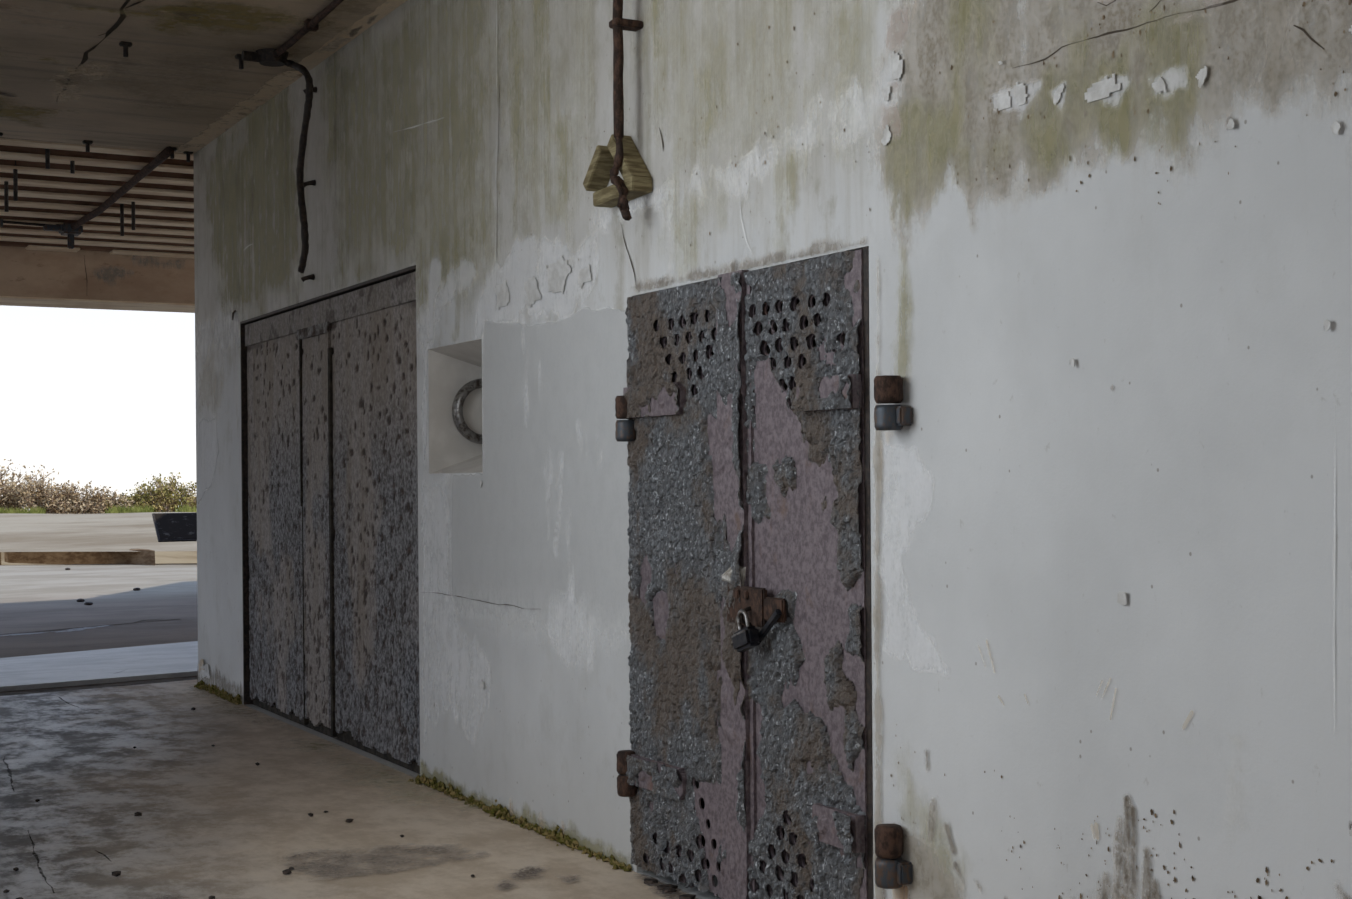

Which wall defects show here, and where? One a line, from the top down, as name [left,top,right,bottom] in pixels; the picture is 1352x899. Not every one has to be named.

crack [56,0,145,102]
crack [1014,0,1237,70]
crack [1293,25,1324,49]
peeling [994,82,1037,111]
peeling [1053,83,1065,105]
water stain [855,0,1352,239]
peeling [1084,73,1127,103]
peeling [1152,66,1207,94]
water stain [636,241,842,291]
water stain [894,799,961,899]
water stain [1058,795,1194,899]